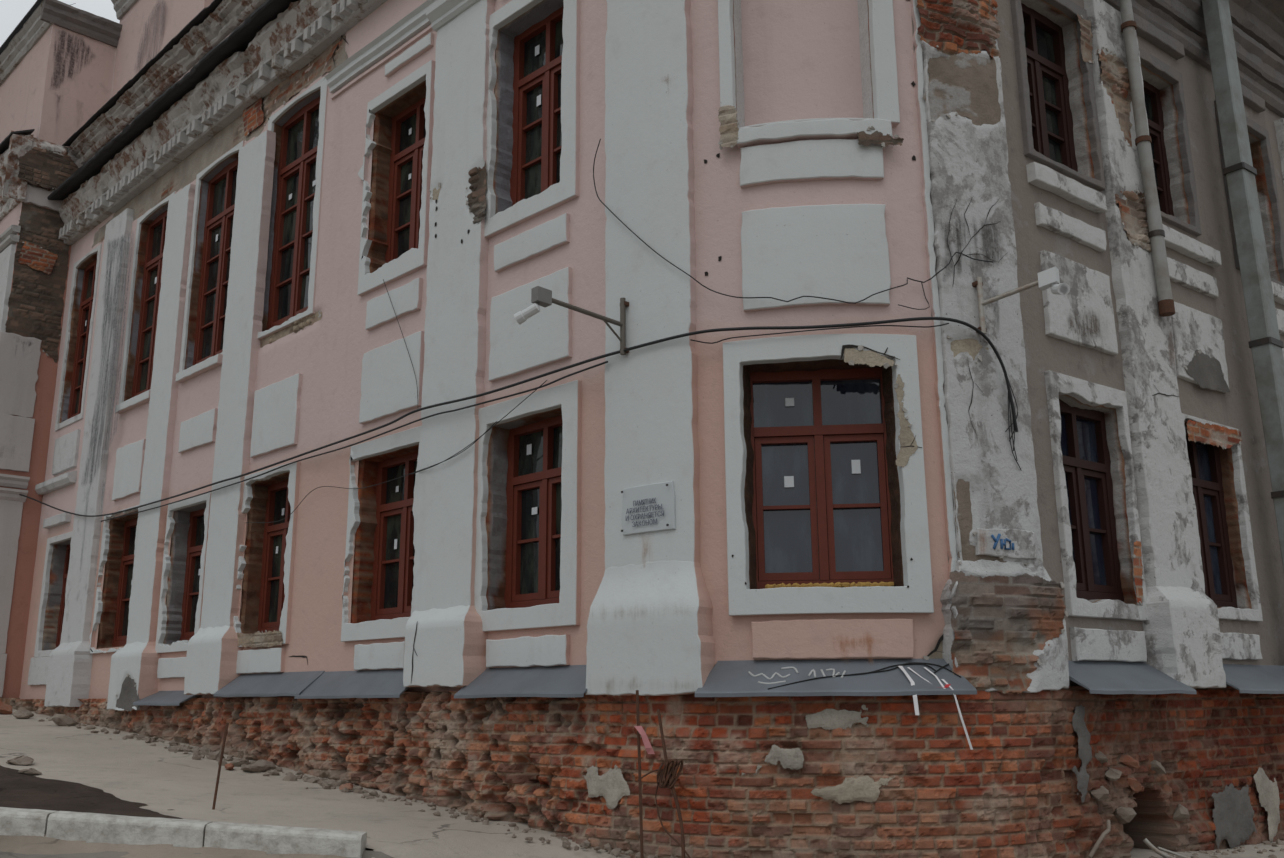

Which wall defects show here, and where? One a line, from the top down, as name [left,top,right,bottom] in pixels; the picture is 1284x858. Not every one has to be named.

flaking render [18,146,79,189]
peeling [92,35,348,247]
peeling [461,162,487,244]
flaking render [704,105,739,164]
flaking render [911,0,1001,126]
peeling [1077,14,1132,147]
peeling [1115,190,1151,252]
flaking render [5,202,70,363]
peeling [844,345,918,467]
flaking render [1187,420,1242,449]
flaking render [923,472,1069,694]